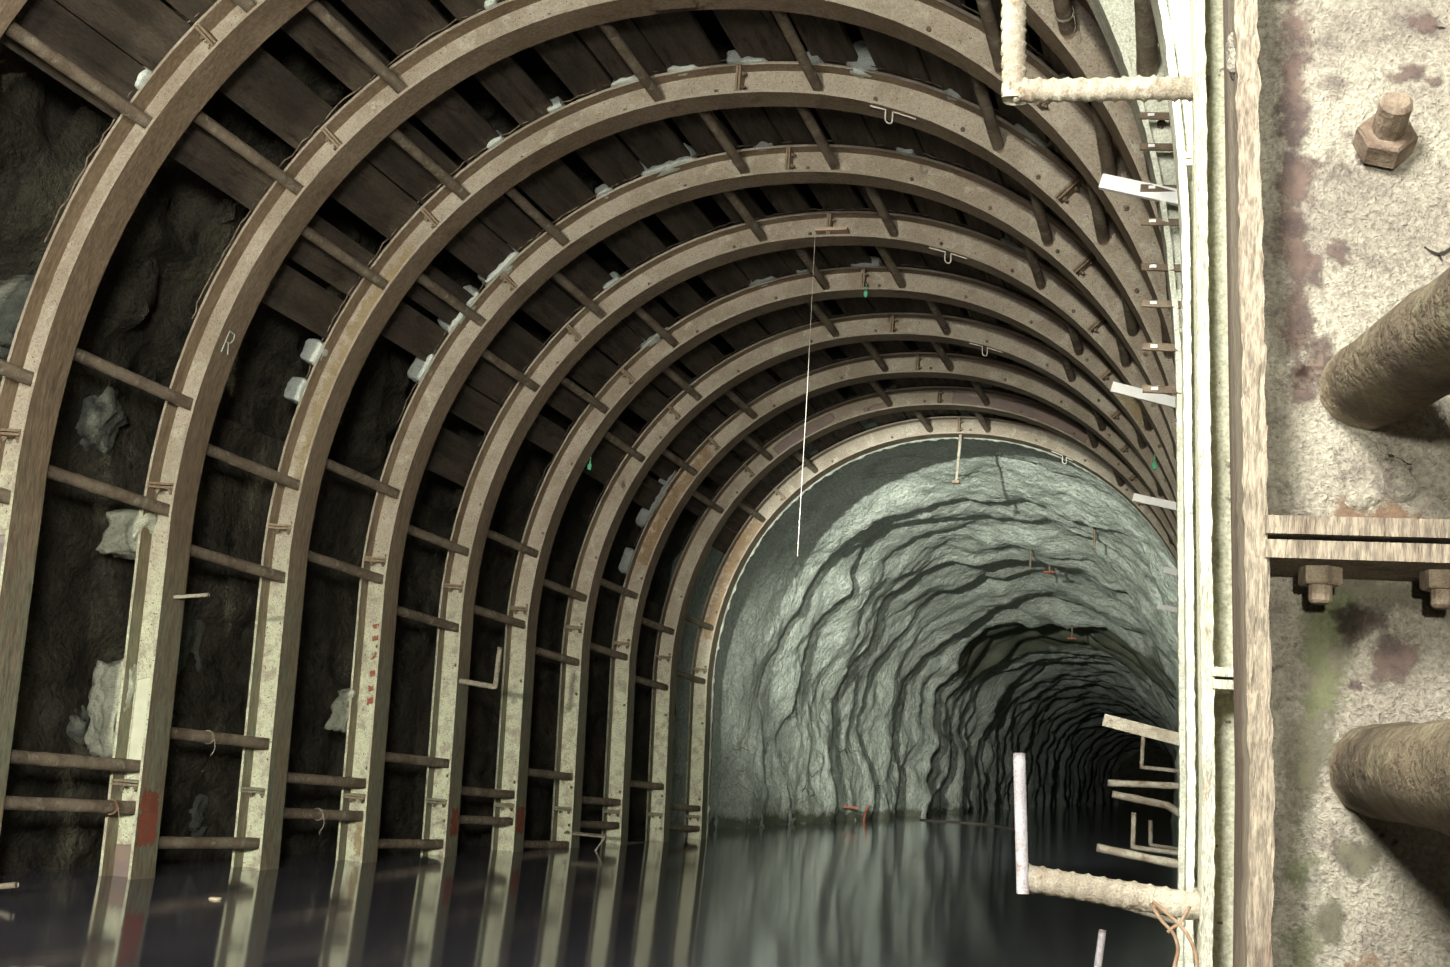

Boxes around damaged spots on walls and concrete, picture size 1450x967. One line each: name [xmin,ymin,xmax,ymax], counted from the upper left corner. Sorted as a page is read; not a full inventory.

rust [1409,12,1438,33]
rust [1388,64,1441,86]
rust [1274,0,1350,402]